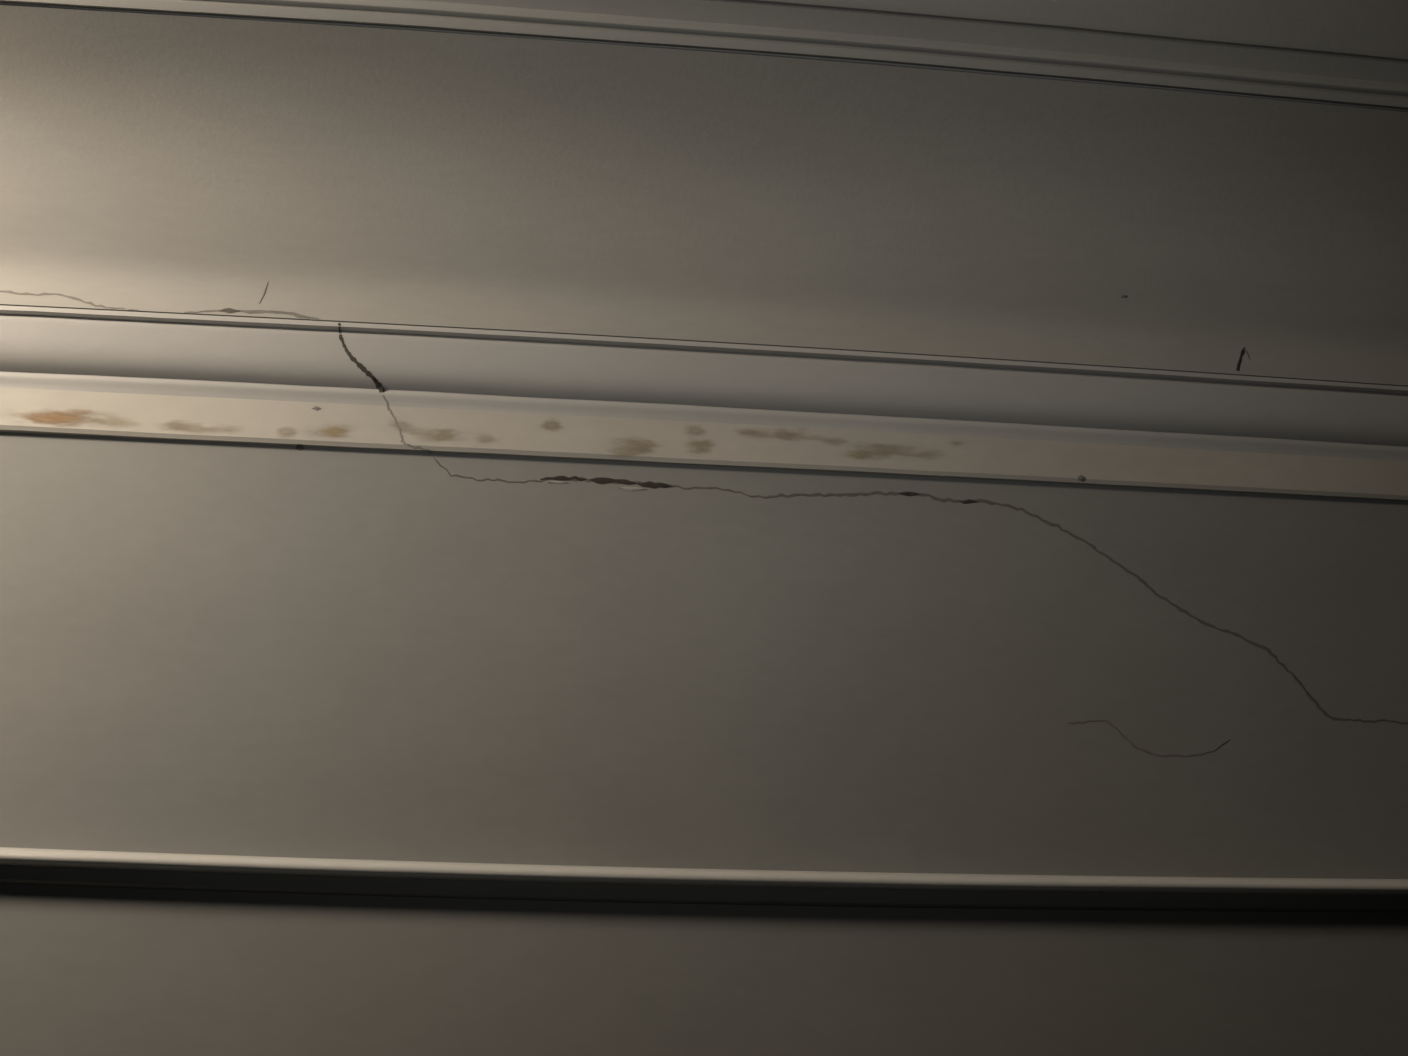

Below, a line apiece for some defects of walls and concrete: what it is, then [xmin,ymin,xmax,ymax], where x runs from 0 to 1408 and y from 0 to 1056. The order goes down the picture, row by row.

crack [0,290,136,311]
crack [185,283,1408,724]